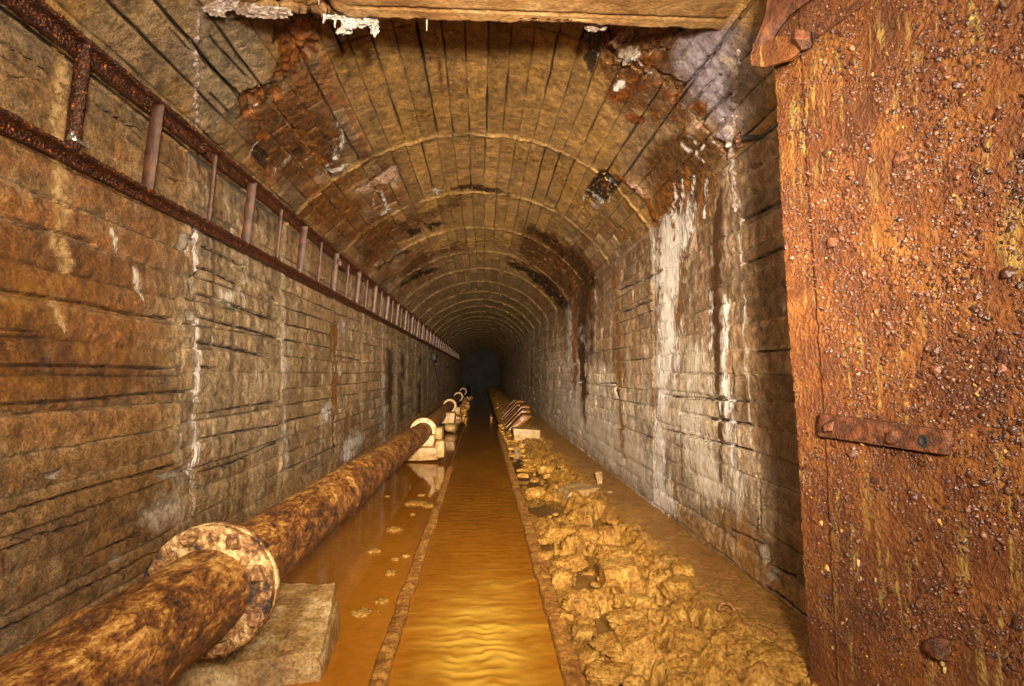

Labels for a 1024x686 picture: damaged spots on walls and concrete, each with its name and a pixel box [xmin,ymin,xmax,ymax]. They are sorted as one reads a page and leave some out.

spalling [200,0,321,115]
rust [238,86,508,268]
leakage [190,319,217,403]
leakage [214,270,247,309]
rust [330,308,349,445]
leakage [508,135,747,520]